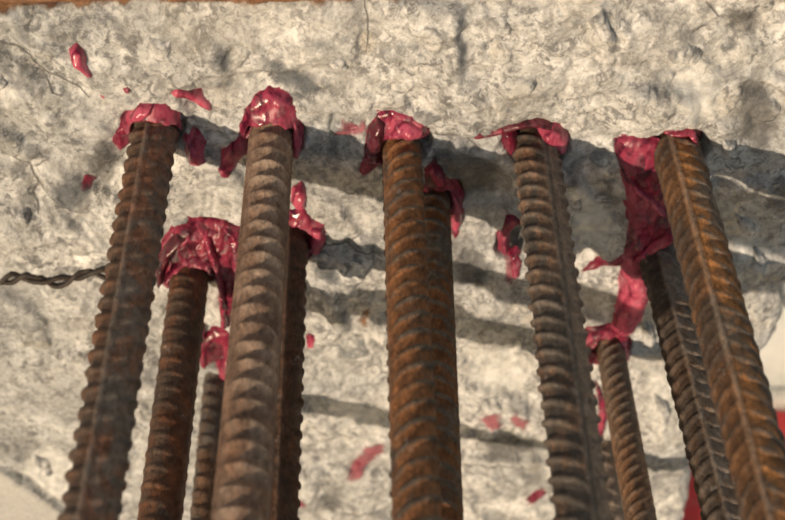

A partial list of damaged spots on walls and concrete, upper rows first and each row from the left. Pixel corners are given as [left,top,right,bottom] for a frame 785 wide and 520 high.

crack [0,5,89,98]
corrosion [0,0,130,13]
spalling [148,37,171,62]
spalling [583,8,619,46]
crack [13,157,79,216]
spalling [204,281,230,333]
spalling [319,289,341,316]
spalling [0,273,106,514]
spalling [119,283,169,520]
spalling [591,364,603,415]
spalling [627,301,691,520]
spalling [182,361,219,520]